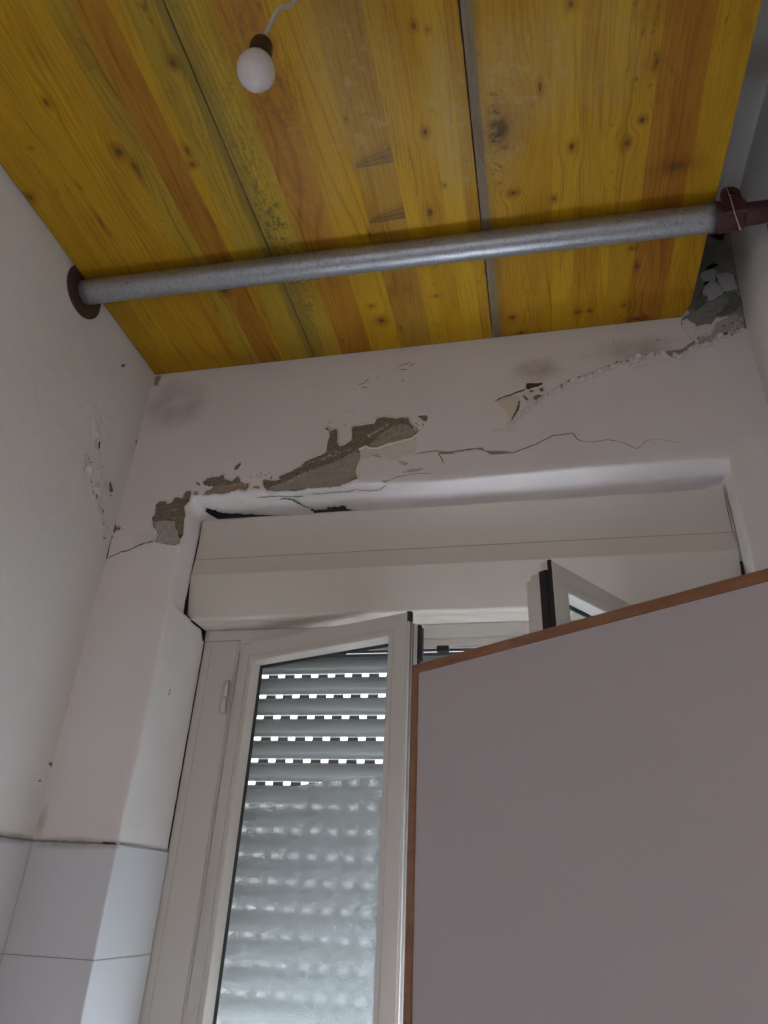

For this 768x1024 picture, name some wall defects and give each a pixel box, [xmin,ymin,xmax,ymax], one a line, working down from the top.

peeling [682,232,746,329]
peeling [496,381,548,420]
flaking render [150,415,428,548]
crack [257,433,678,508]
crack [107,529,158,559]